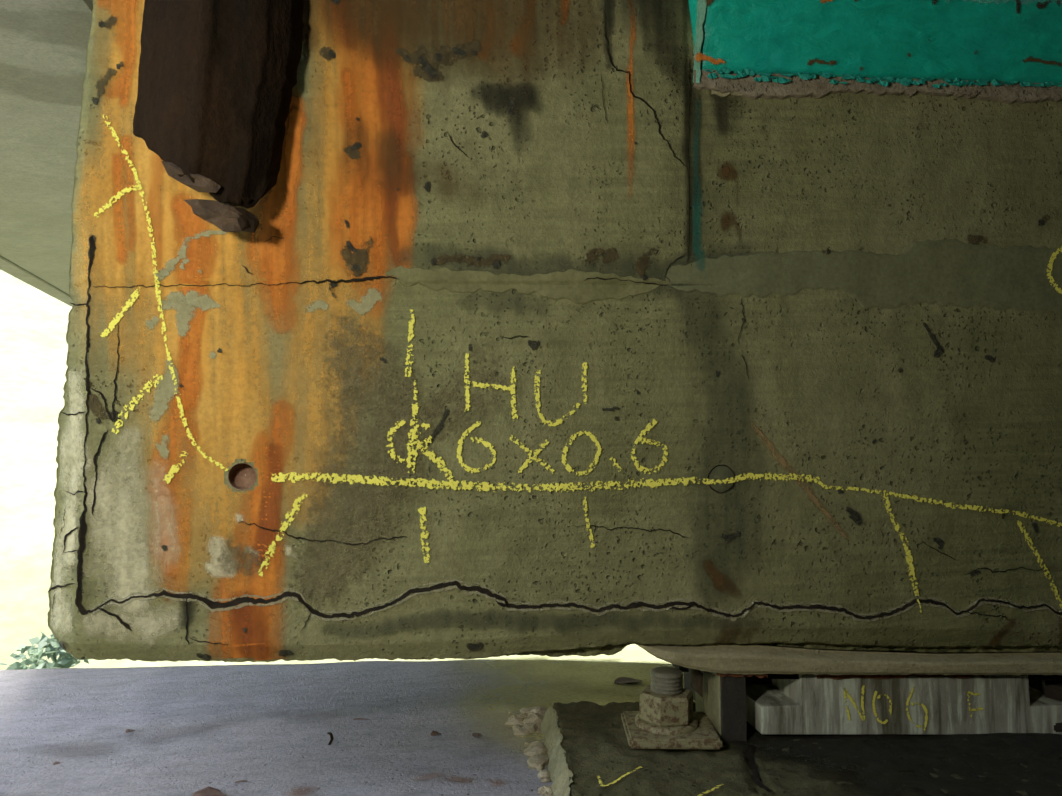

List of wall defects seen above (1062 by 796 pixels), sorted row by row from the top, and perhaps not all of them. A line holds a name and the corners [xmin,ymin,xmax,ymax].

leakage [302,0,564,137]
leakage [604,0,613,67]
rust [627,2,635,148]
leakage [627,0,699,225]
spalling [692,67,1062,104]
rust [81,0,304,661]
rust [295,0,415,469]
crack [48,235,1062,645]